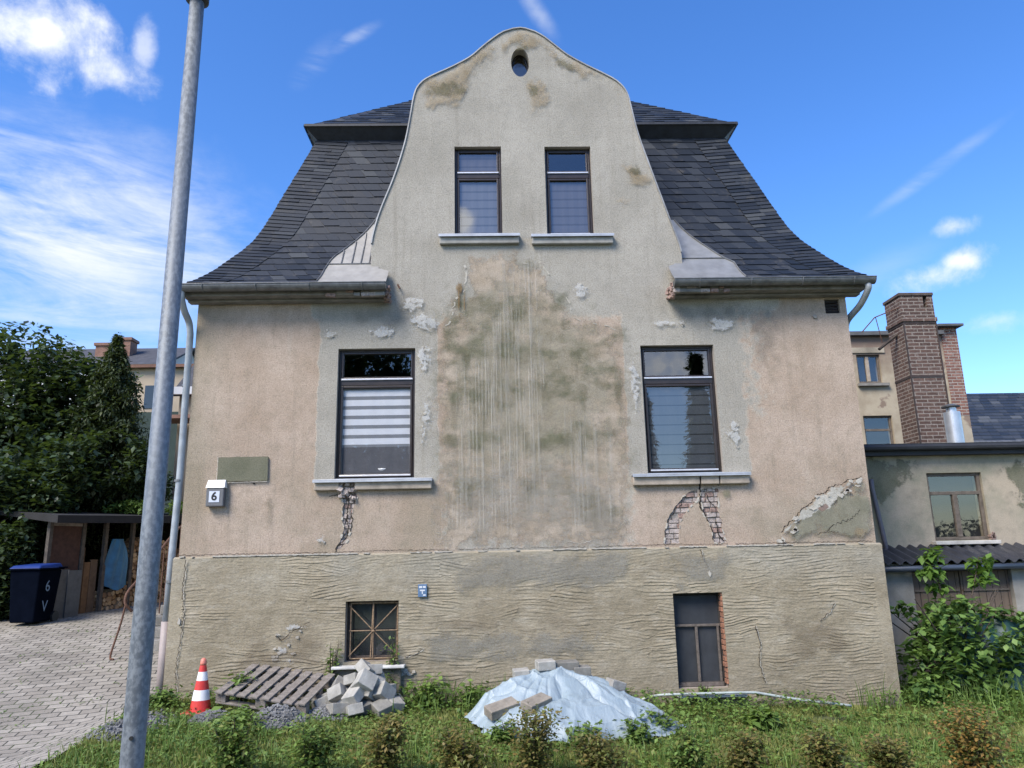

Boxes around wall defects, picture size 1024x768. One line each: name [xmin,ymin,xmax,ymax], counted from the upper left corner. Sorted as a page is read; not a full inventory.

flaking render [325,253,640,552]
spalling [664,484,726,544]
flaking render [776,477,871,543]
crack [175,482,871,692]
spalling [271,622,310,662]